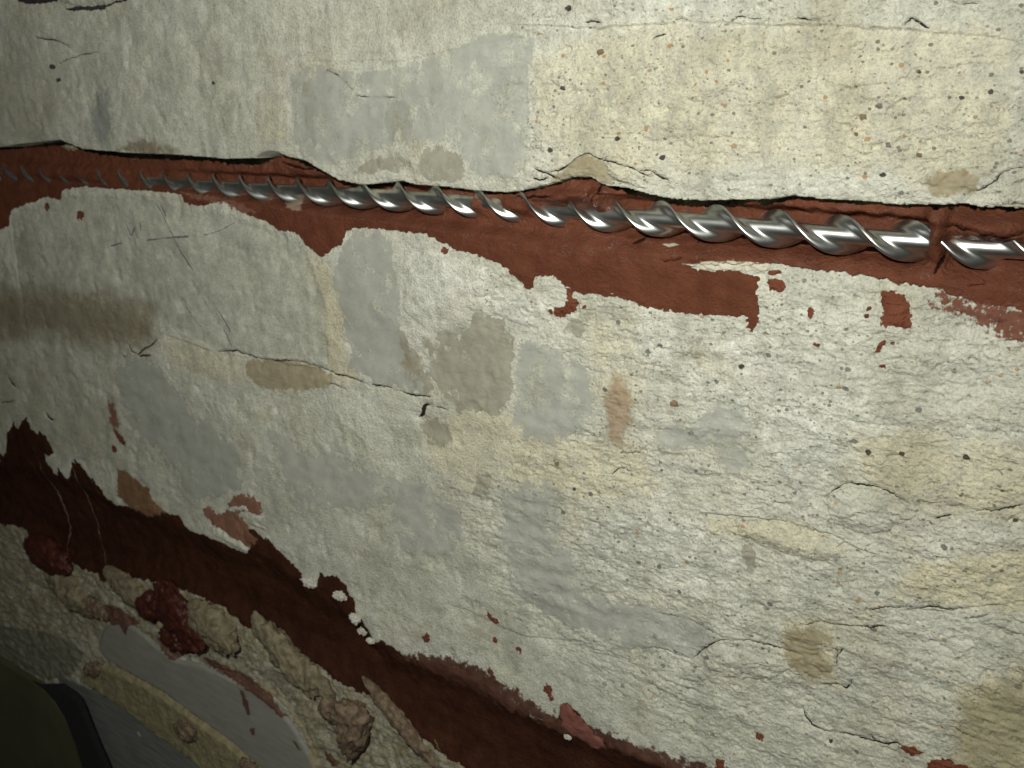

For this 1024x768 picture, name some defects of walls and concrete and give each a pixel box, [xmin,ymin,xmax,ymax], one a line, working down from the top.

crack [282,162,320,170]
crack [516,152,667,202]
flaking render [605,163,648,188]
flaking render [996,168,1024,205]
flaking render [402,250,553,334]
crack [219,350,444,417]
flaking render [228,505,267,530]
flaking render [212,527,248,553]